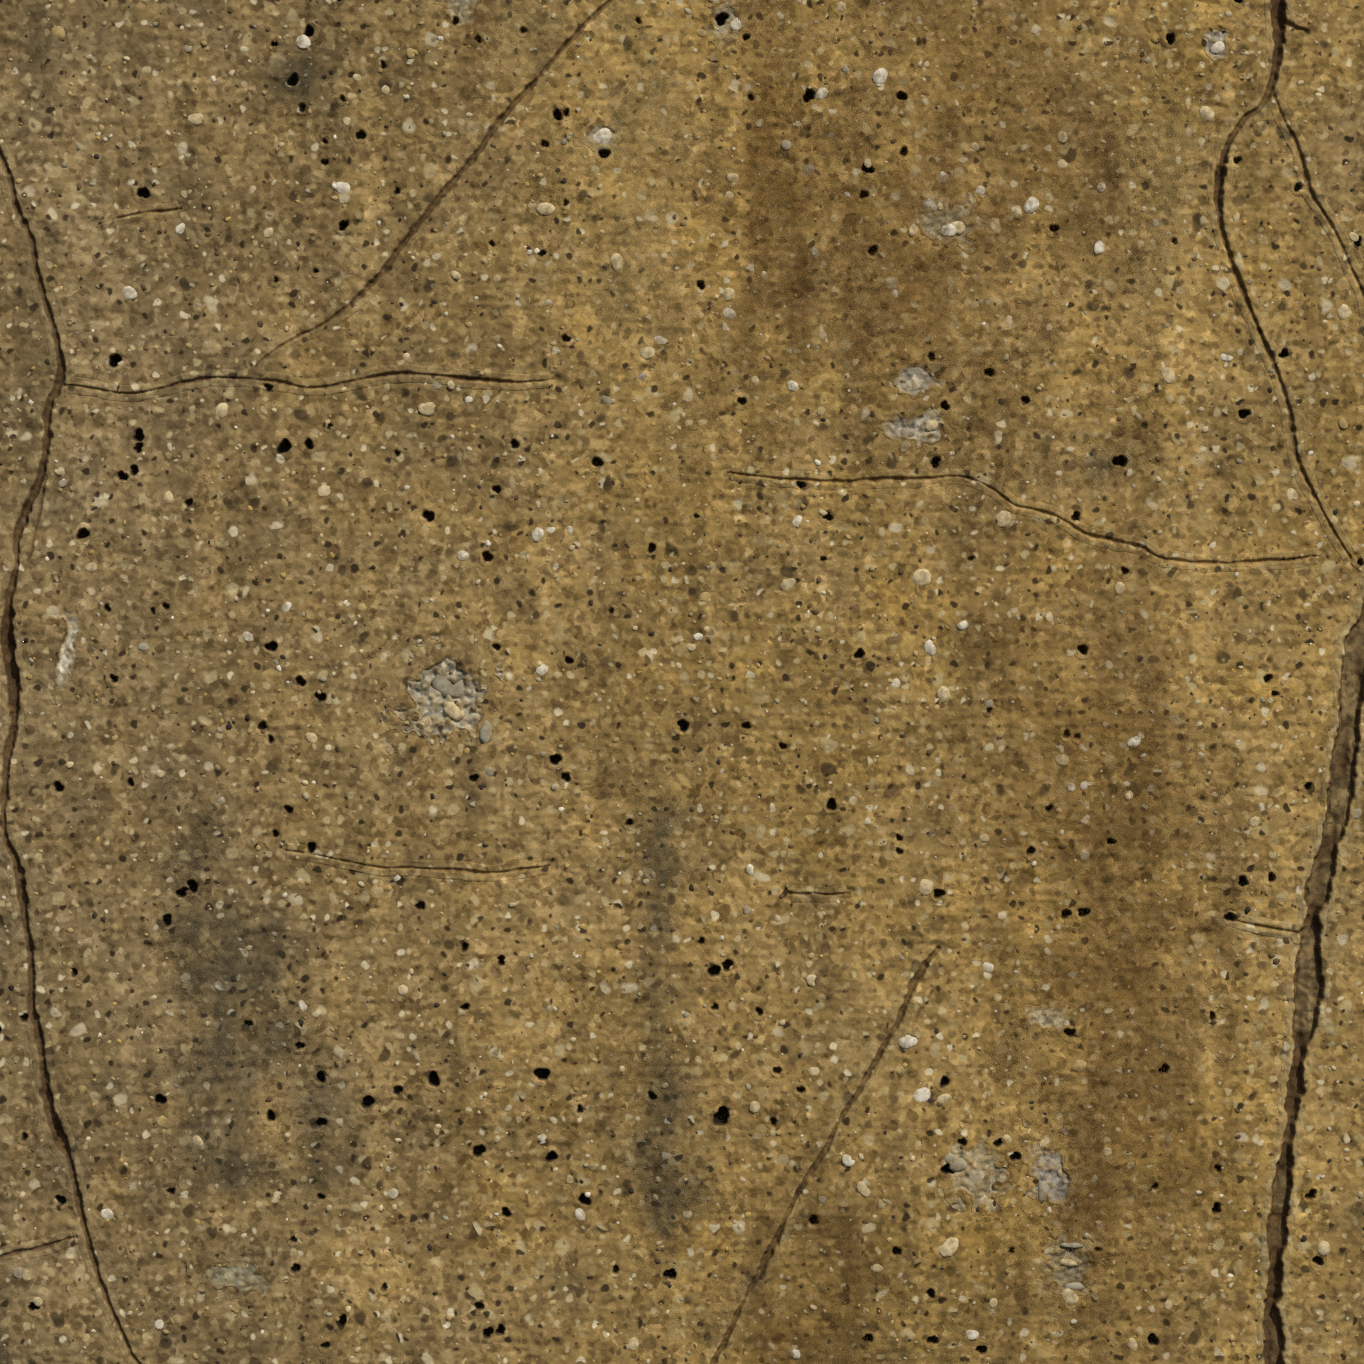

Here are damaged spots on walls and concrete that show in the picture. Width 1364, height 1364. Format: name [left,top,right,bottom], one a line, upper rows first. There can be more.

crack [0,0,629,1364]
crack [702,0,1364,1364]